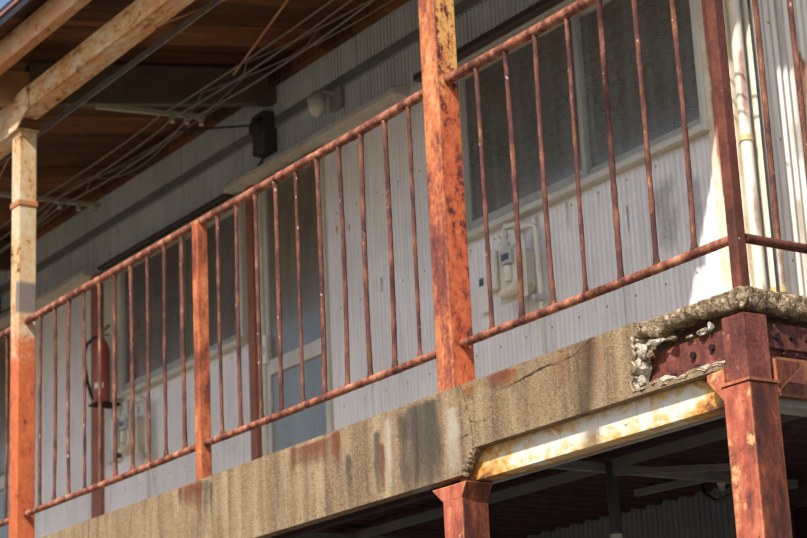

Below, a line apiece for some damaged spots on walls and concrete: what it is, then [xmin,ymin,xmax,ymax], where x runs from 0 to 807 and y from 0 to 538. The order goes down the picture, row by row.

crack [497,339,591,390]
spalling [628,322,725,392]
rust [290,431,339,463]